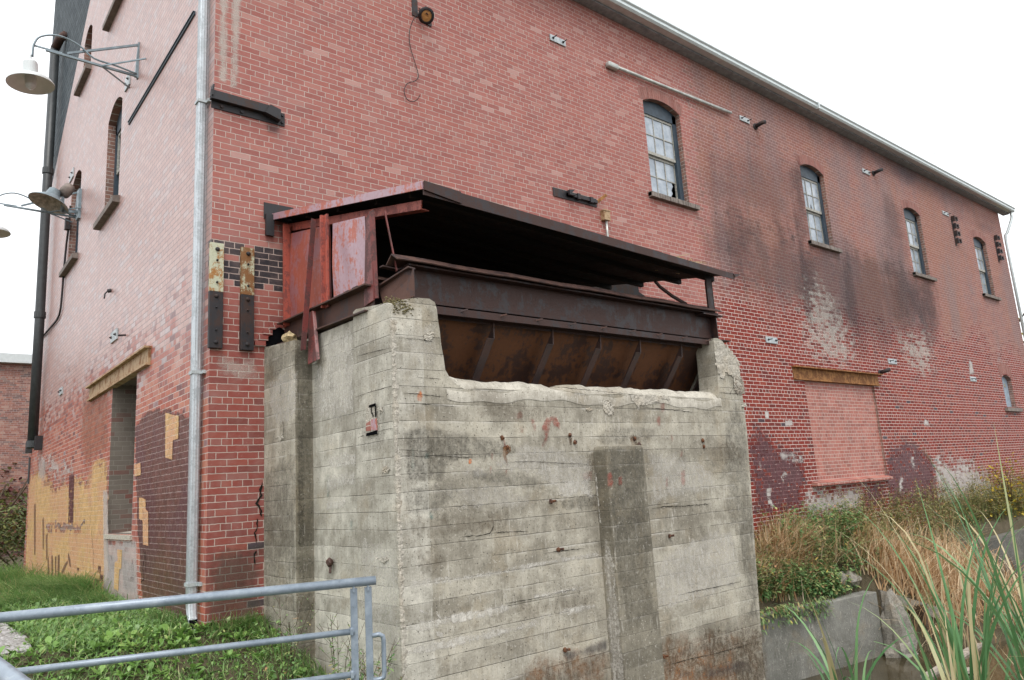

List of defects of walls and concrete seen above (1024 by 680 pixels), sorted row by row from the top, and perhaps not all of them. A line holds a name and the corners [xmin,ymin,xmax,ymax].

spalling [447,376,722,416]
spalling [714,341,747,407]
peeling [25,458,108,589]
crack [254,482,263,564]
damp [516,448,601,523]